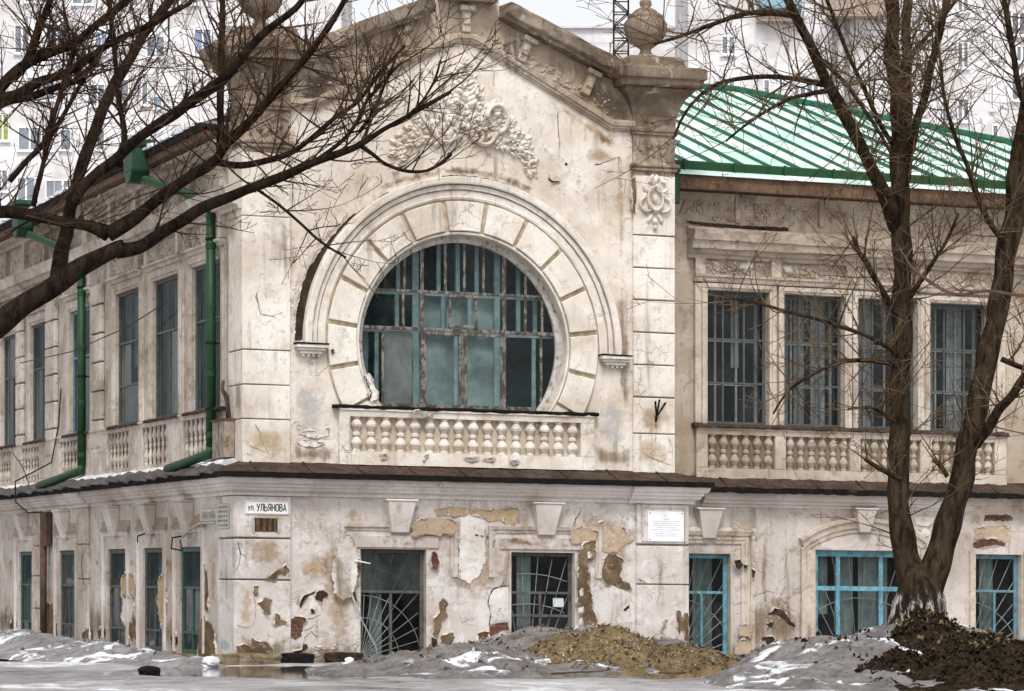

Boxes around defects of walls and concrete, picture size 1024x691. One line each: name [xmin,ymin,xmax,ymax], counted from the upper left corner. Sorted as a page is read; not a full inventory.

flaking render [297,426,330,448]
flaking render [120,571,136,644]
flaking render [156,574,178,647]
flaking render [196,562,218,656]
flaking render [252,533,362,658]
flaking render [411,506,529,584]
flaking render [569,520,634,627]
flaking render [735,607,795,655]
flaking render [973,512,1014,550]